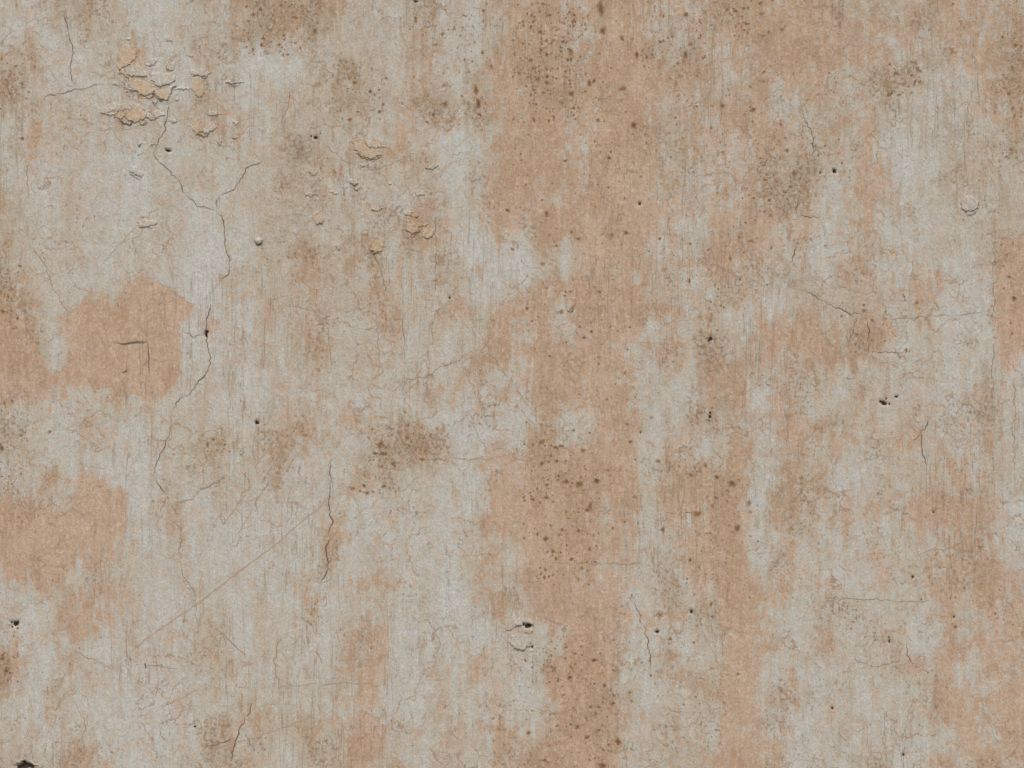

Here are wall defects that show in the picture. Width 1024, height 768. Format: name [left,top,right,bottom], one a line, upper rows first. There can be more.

flaking render [100,36,240,147]
crack [154,106,261,278]
crack [175,305,211,404]
crack [154,433,224,616]
crack [315,463,333,659]